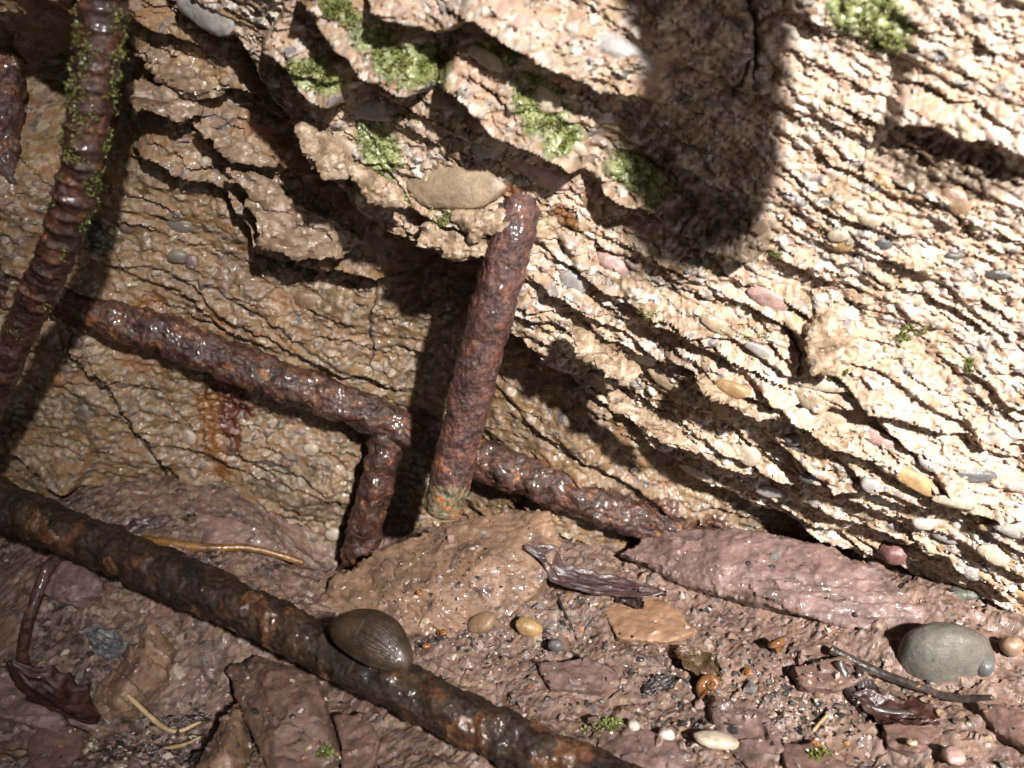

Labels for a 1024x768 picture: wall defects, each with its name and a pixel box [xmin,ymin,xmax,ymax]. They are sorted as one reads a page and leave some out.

spalling [416,206,510,262]
corrosion [550,204,579,232]
corrosion [130,292,171,312]
crack [152,268,415,391]
crack [61,319,179,479]
corrosion [198,372,260,481]
spalling [566,326,699,454]
spalling [695,372,787,422]
crack [226,447,334,522]